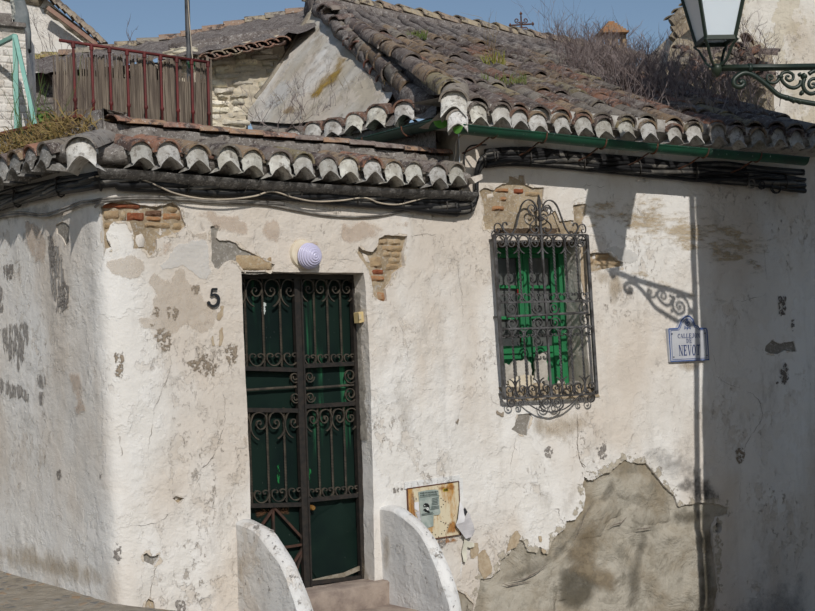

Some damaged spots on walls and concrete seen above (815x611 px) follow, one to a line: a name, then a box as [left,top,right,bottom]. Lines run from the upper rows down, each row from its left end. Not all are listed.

spalling [26,221,70,266]
peeling [57,283,69,311]
spalling [99,200,188,258]
peeling [187,306,238,377]
spalling [208,225,274,275]
spalling [357,233,408,301]
spalling [479,176,586,240]
spalling [580,246,638,297]
spalling [765,296,796,356]
peeling [356,323,367,441]
spalling [512,413,533,437]
peeling [470,543,492,579]